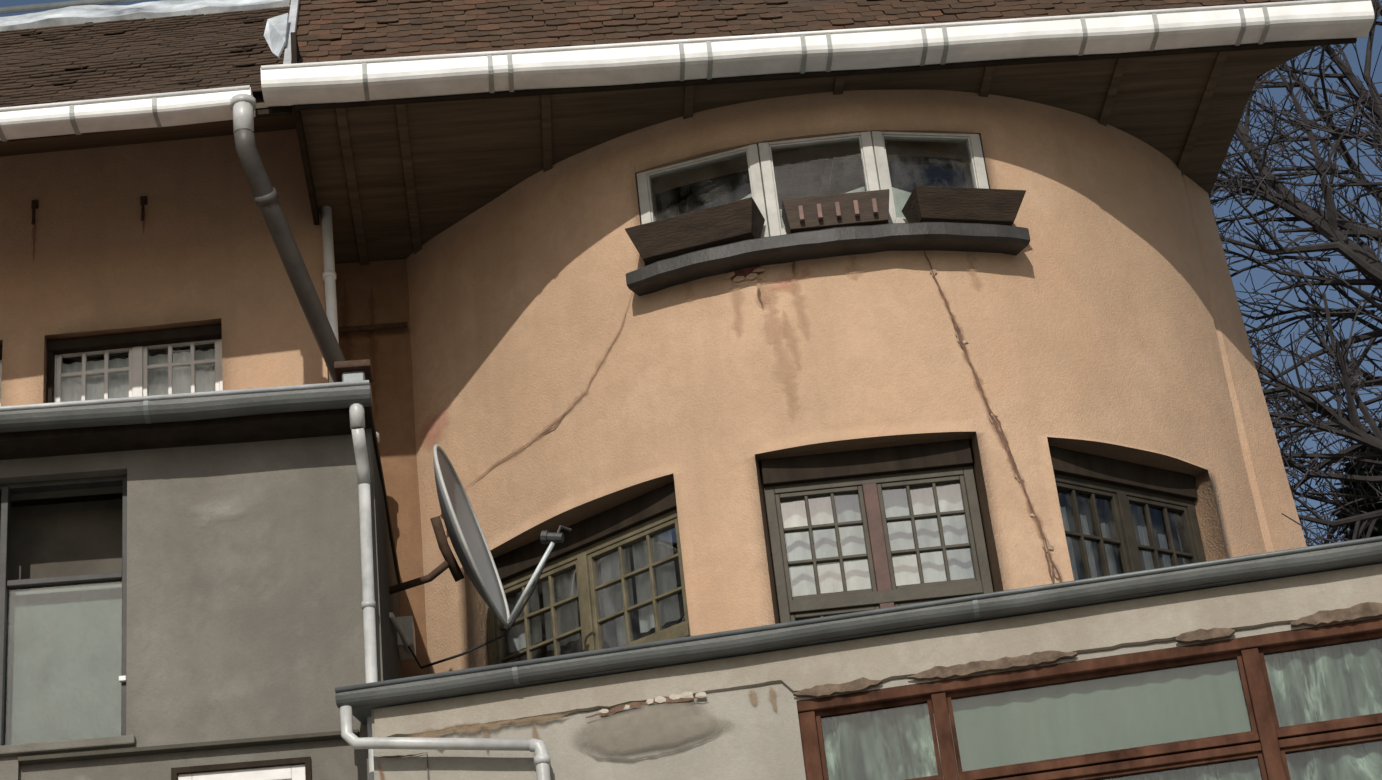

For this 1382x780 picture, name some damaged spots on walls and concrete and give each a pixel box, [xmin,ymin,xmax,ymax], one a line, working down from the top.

crack [464,291,633,489]
crack [924,250,1062,583]
flaking render [907,650,1077,681]
flaking render [1290,602,1382,627]